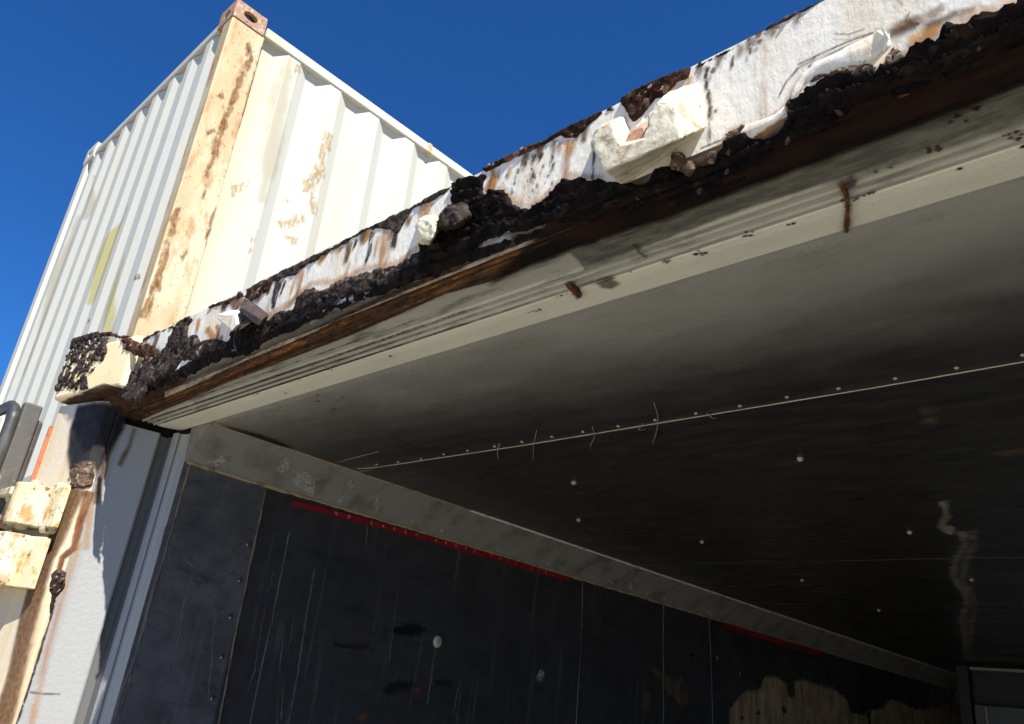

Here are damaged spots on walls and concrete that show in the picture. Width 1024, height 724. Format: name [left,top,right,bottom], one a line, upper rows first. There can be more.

rust [850,21,1010,86]
rust [61,35,1024,502]
rust [0,487,94,724]